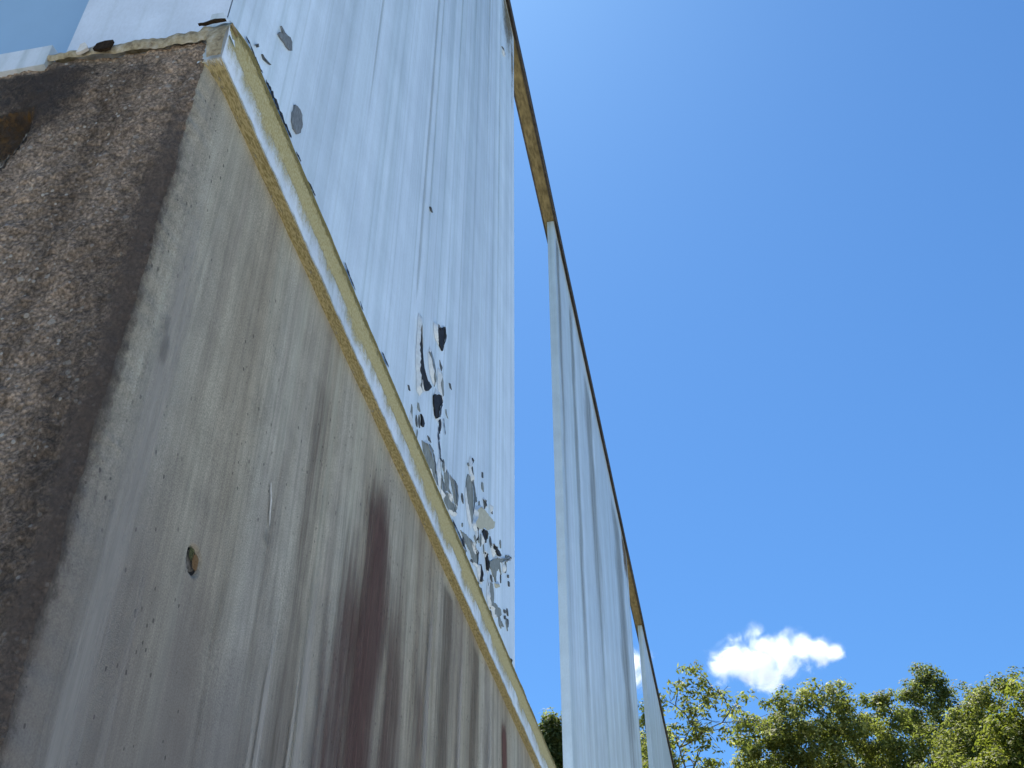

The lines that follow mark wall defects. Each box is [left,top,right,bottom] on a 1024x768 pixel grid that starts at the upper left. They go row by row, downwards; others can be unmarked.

peeling [277,26,292,51]
peeling [291,105,303,134]
spalling [0,18,238,647]
rust [203,58,541,768]
peeling [408,314,512,631]